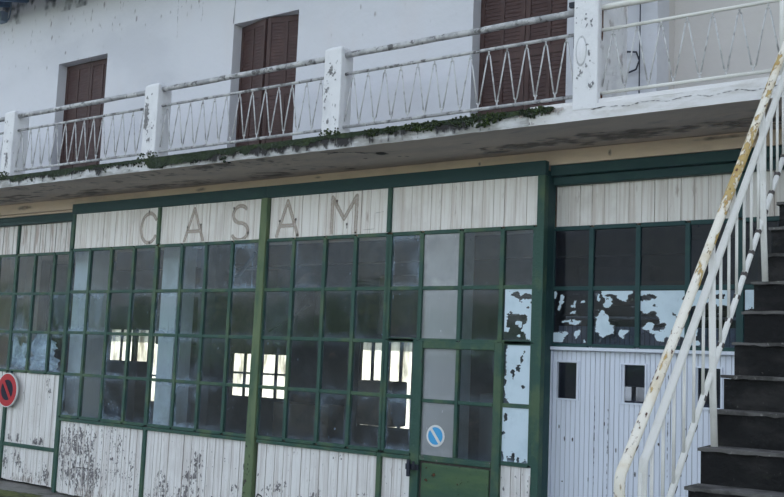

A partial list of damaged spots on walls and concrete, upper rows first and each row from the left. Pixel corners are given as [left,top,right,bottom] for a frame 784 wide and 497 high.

leakage [247,137,352,156]
leakage [435,122,468,134]
leakage [485,126,699,154]
rust [718,54,782,221]
peeling [553,291,586,343]
peeling [595,290,727,342]
peeling [501,289,532,463]
peeling [3,433,49,485]
peeling [59,424,213,497]